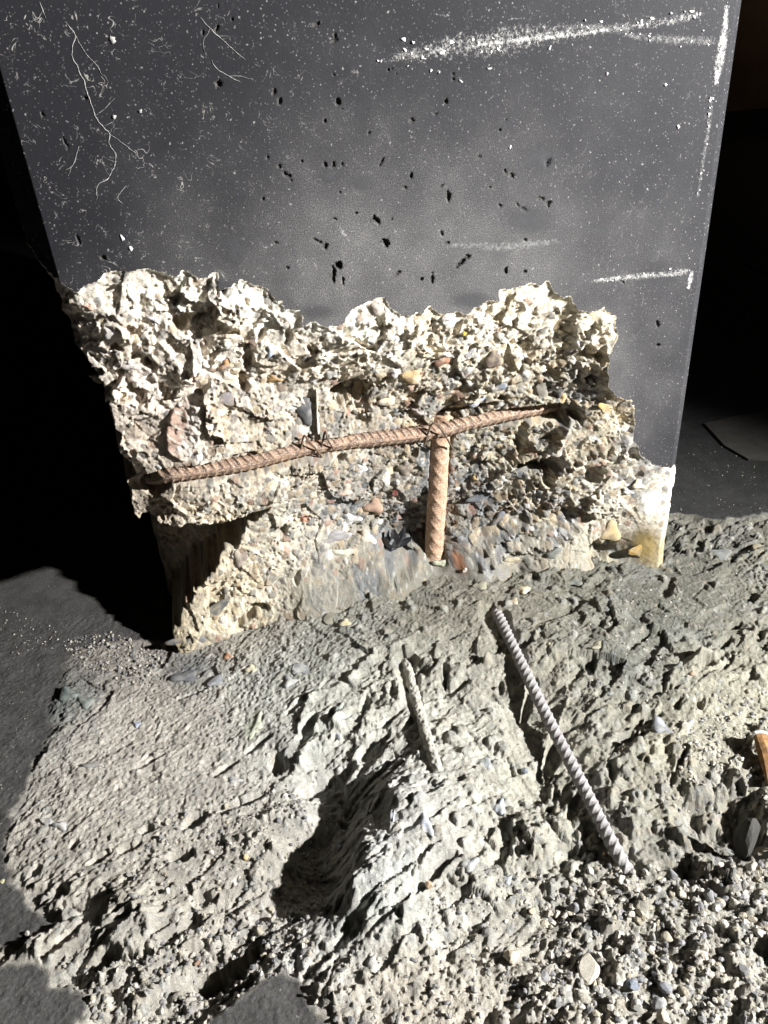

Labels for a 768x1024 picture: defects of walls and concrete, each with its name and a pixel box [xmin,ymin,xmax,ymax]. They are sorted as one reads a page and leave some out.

spalling [0,246,768,1024]